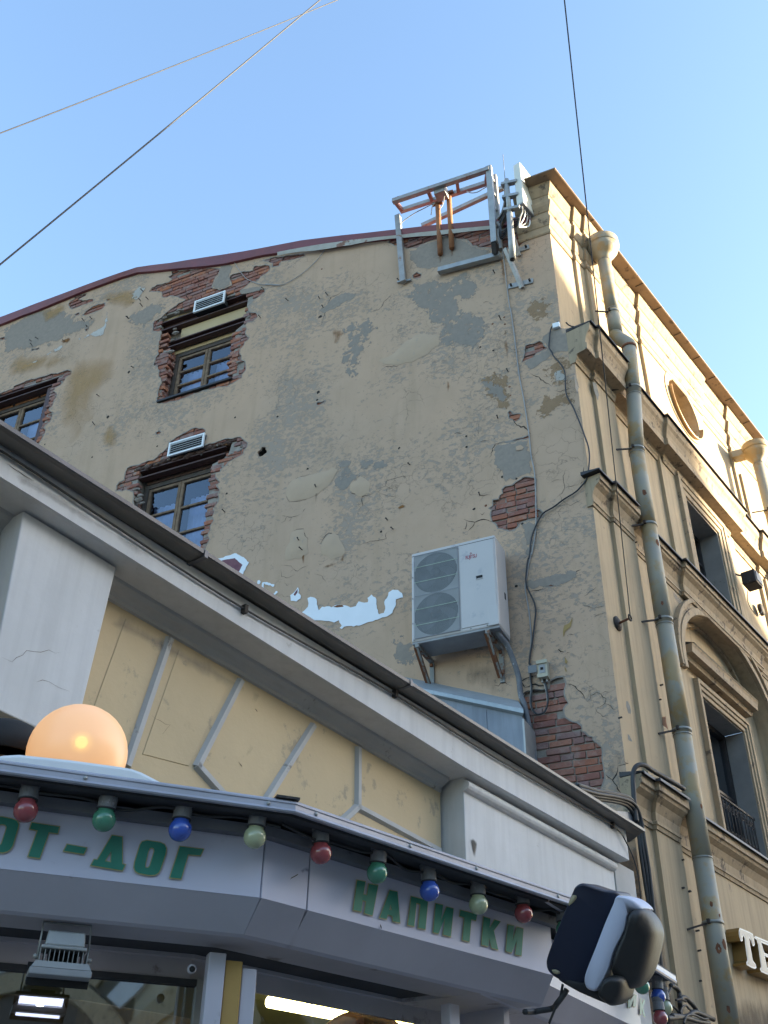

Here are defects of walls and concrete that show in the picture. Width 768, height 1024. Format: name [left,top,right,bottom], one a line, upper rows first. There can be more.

flaking render [1,370,72,444]
flaking render [149,253,306,404]
flaking render [521,341,547,363]
flaking render [115,427,267,550]
flaking render [488,476,545,532]
flaking render [520,658,606,789]